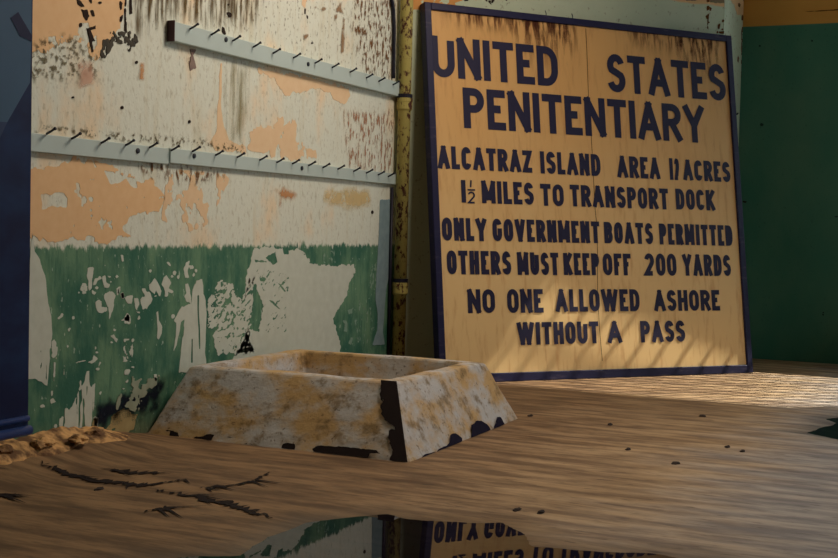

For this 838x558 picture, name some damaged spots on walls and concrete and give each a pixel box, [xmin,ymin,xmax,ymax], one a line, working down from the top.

peeling [32,0,125,61]
damp [99,0,258,58]
peeling [210,63,317,162]
peeling [257,67,350,104]
peeling [29,156,229,408]
peeling [78,199,390,373]
peeling [54,329,160,432]